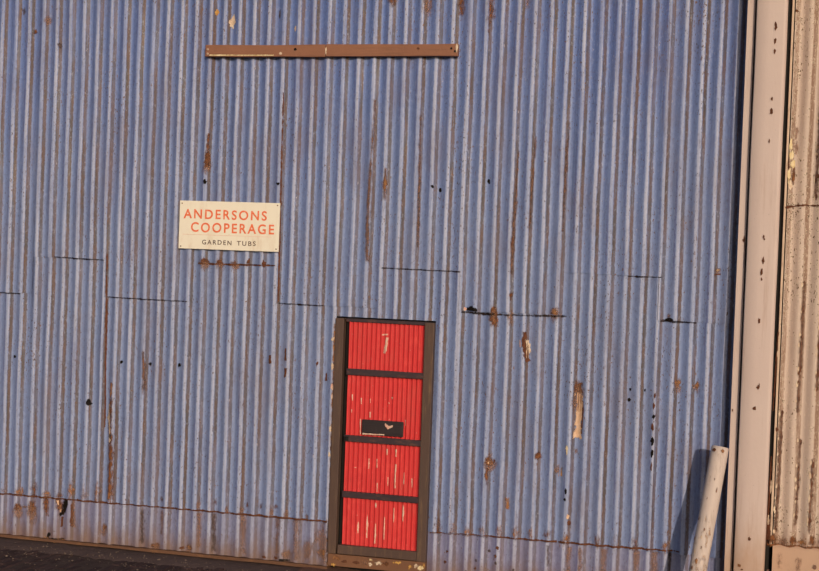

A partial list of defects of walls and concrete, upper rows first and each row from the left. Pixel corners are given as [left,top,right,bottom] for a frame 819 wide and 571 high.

rust [198,93,323,306]
rust [0,254,329,566]
peeling [357,505,404,544]
rust [484,455,495,481]